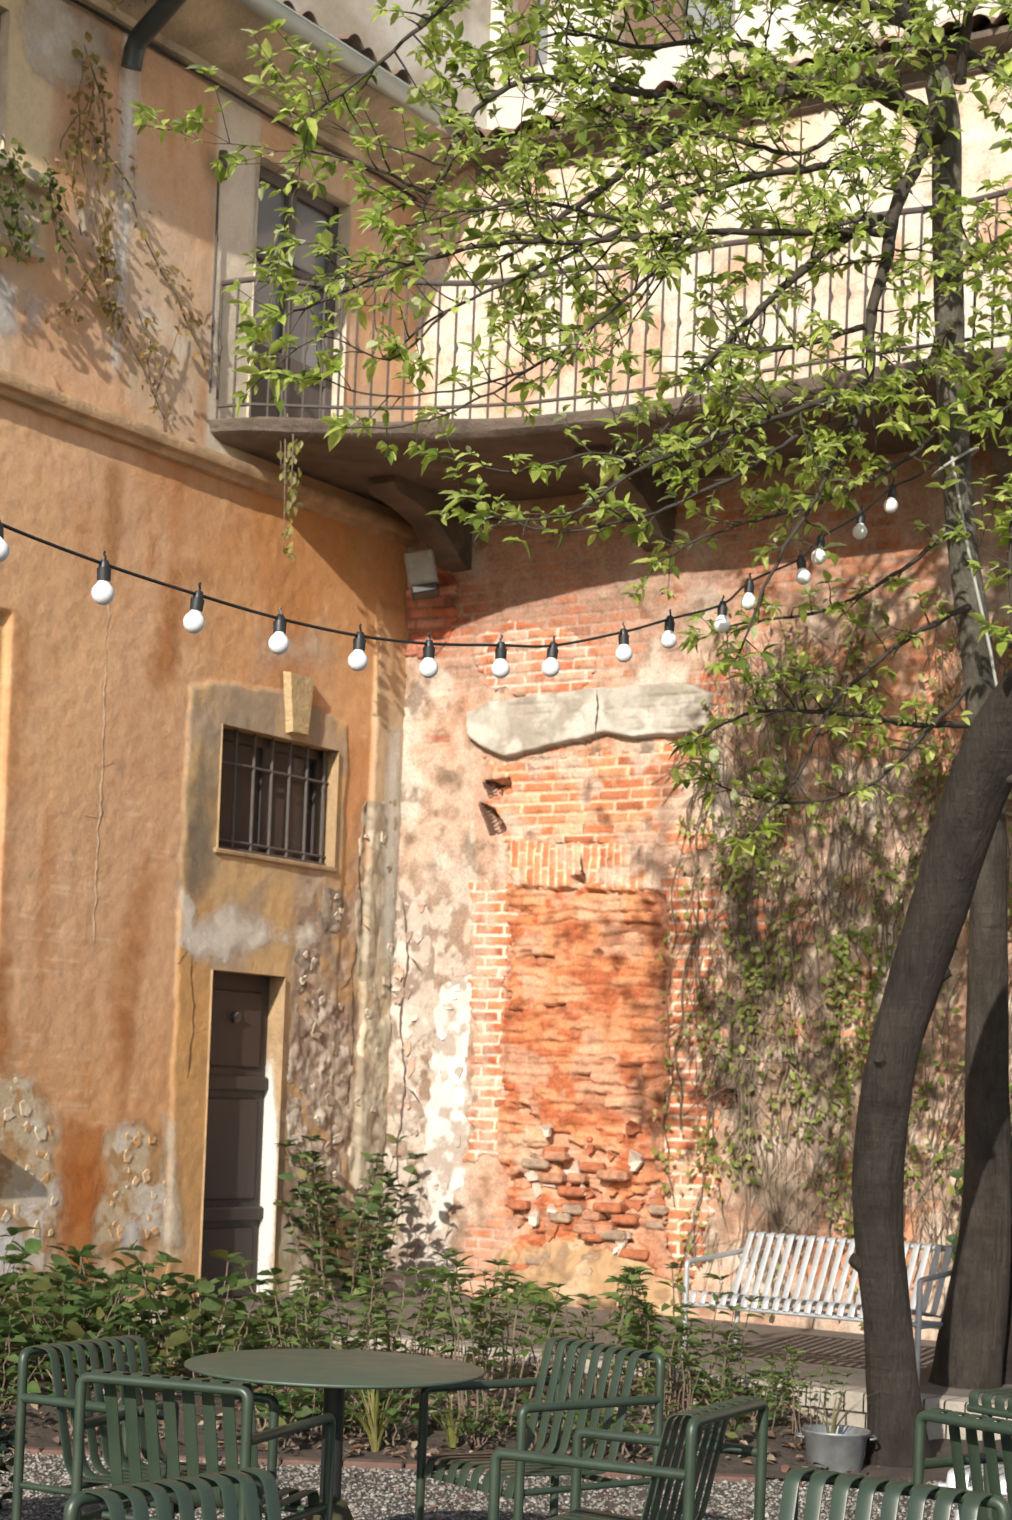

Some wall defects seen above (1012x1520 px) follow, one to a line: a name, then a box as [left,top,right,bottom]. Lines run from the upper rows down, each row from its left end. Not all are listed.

crack [178,911,196,1077]
spalling [181,738,821,1295]
flaking render [823,948,882,1045]
flaking render [0,1073,60,1288]
water stain [61,1127,105,1285]
flaking render [94,1119,170,1254]